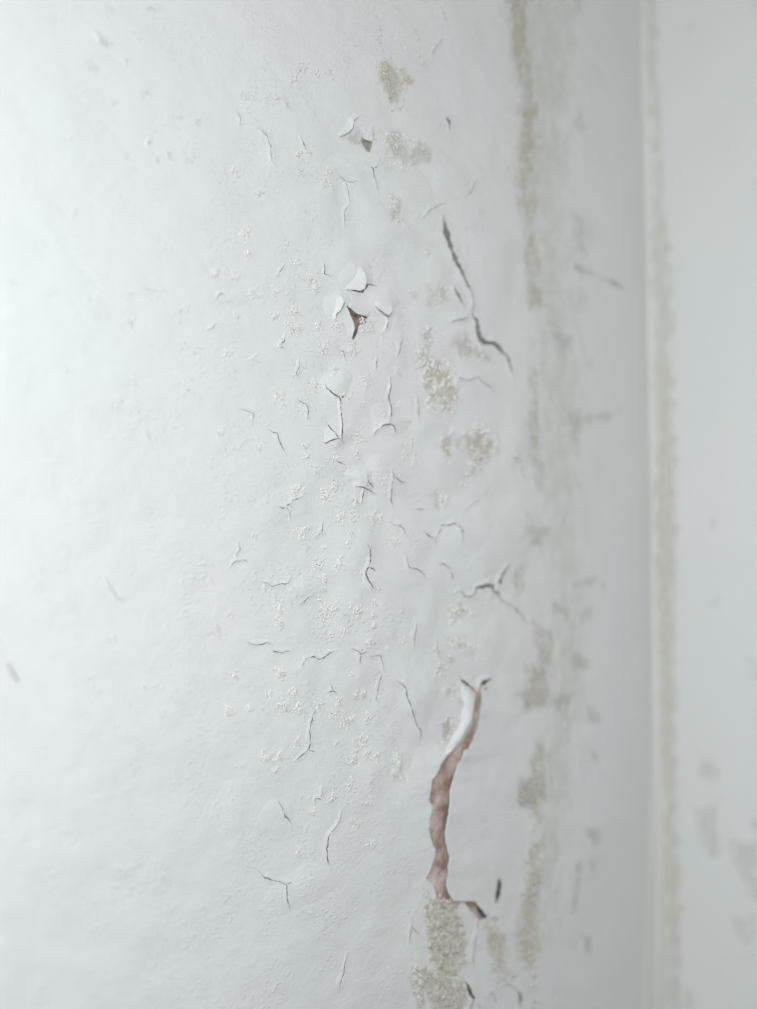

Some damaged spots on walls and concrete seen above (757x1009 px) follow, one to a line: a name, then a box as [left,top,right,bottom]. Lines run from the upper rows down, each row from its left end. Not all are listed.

peeling [336,113,374,152]
peeling [332,266,393,341]
crack [420,200,519,395]
peeling [394,673,523,920]
water stain [412,887,473,1009]
crack [462,977,524,1009]